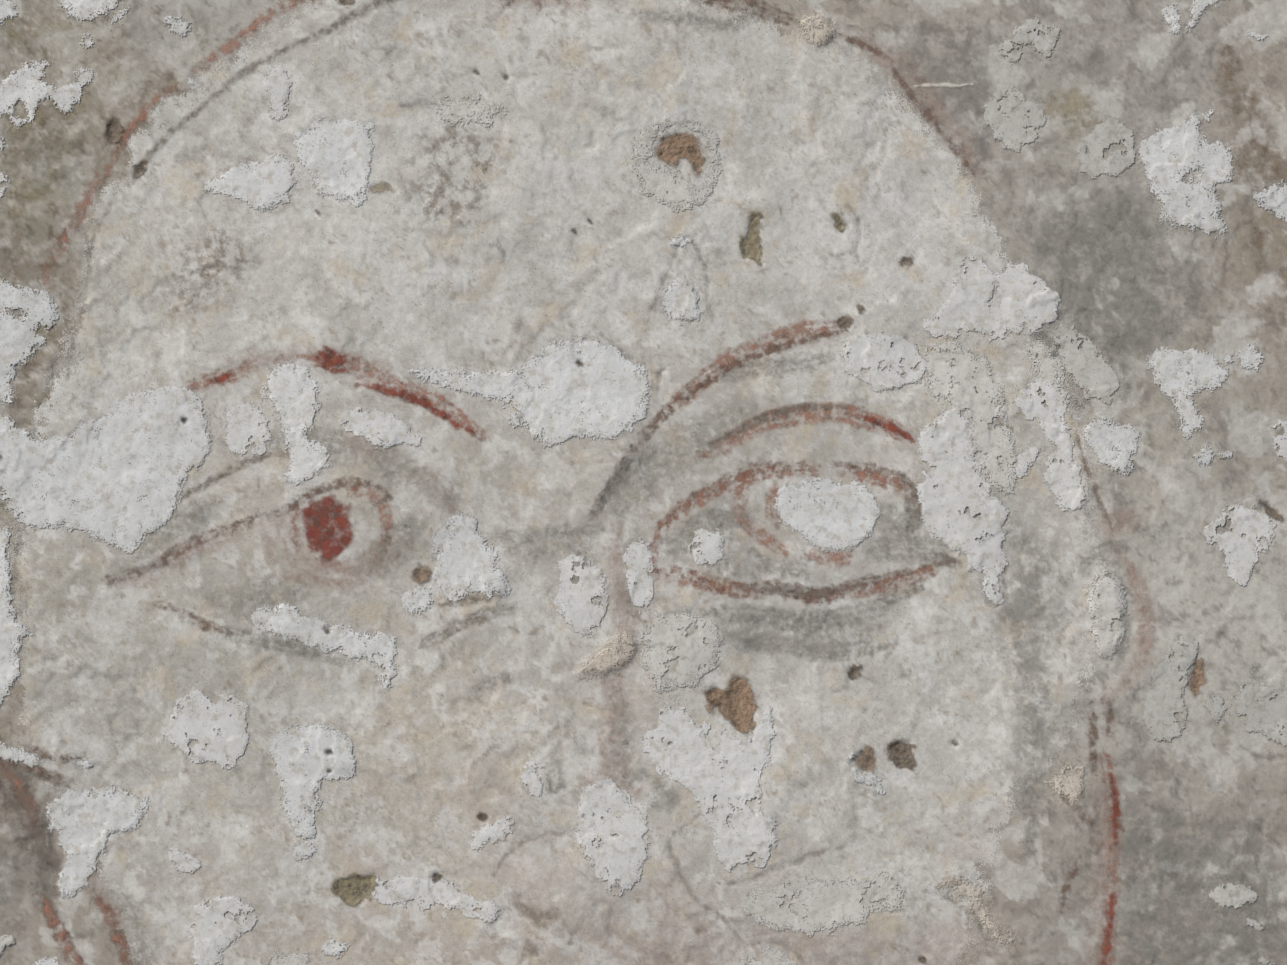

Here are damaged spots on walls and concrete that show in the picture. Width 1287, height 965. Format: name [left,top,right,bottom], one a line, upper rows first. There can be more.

peeling [0,59,93,126]
peeling [1075,107,1234,239]
peeling [0,278,332,704]
peeling [407,333,652,451]
peeling [837,255,1141,605]
peeling [1145,342,1264,466]
peeling [1203,500,1283,586]
peeling [161,689,249,770]
peeling [251,601,398,690]
peeling [622,537,779,872]
peeling [42,756,151,899]
peeling [574,777,651,897]